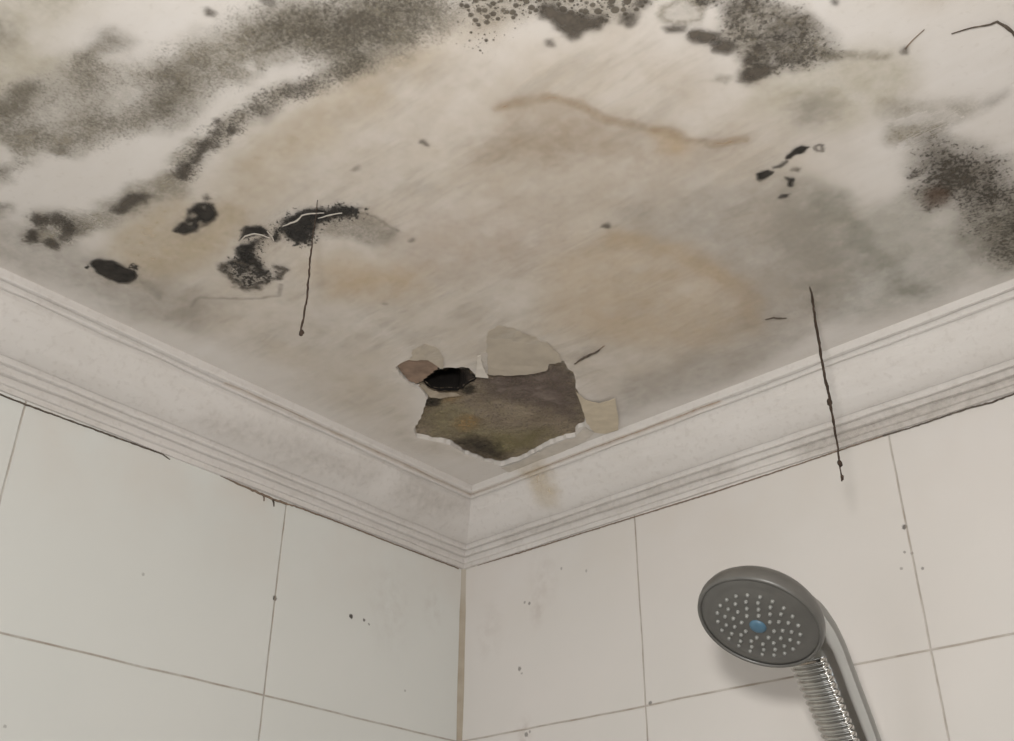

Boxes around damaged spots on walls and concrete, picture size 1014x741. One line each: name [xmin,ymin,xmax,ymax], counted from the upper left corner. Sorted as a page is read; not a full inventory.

damp [450,0,648,51]
damp [666,0,832,81]
crack [951,20,1014,37]
damp [23,0,441,248]
damp [85,259,138,283]
peeling [218,202,369,289]
damp [910,144,1014,265]
spalling [398,325,619,472]
crack [221,393,1014,569]